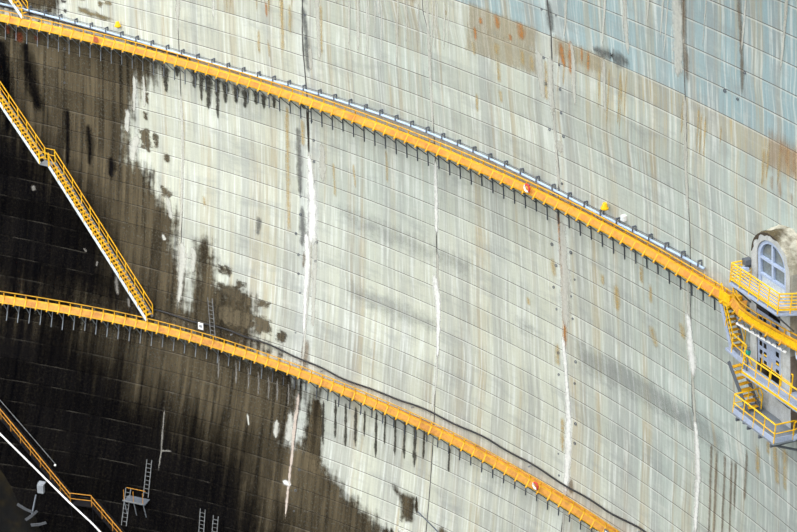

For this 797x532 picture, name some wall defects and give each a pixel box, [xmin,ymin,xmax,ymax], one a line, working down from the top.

water stain [0,0,404,532]
water stain [431,254,440,414]
water stain [334,400,425,465]
water stain [394,486,418,522]
water stain [562,337,571,496]